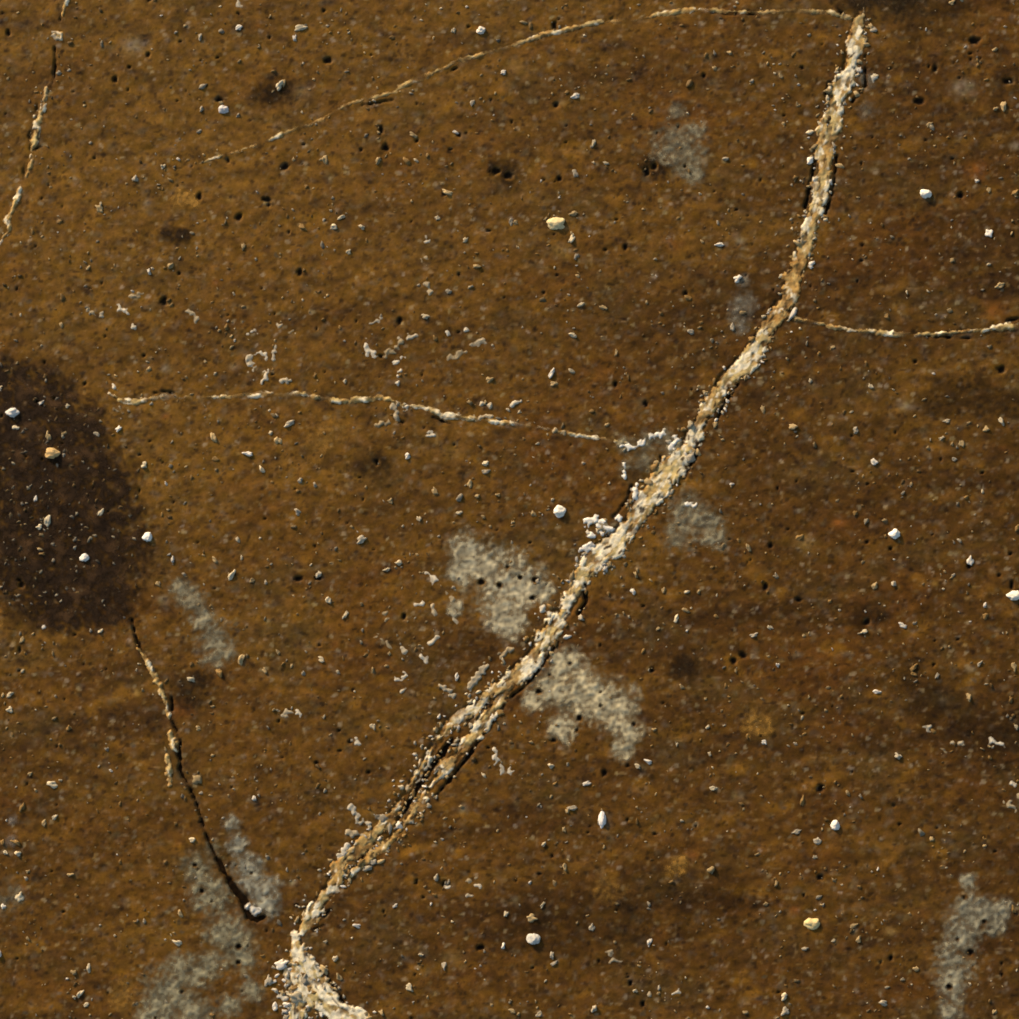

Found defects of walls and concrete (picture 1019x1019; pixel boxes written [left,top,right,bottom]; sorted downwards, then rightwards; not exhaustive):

crack [0,0,70,245]
crack [199,52,485,164]
damp [0,355,147,636]
crack [107,383,173,412]
crack [212,369,522,437]
crack [272,7,1016,1019]
crack [131,619,266,923]